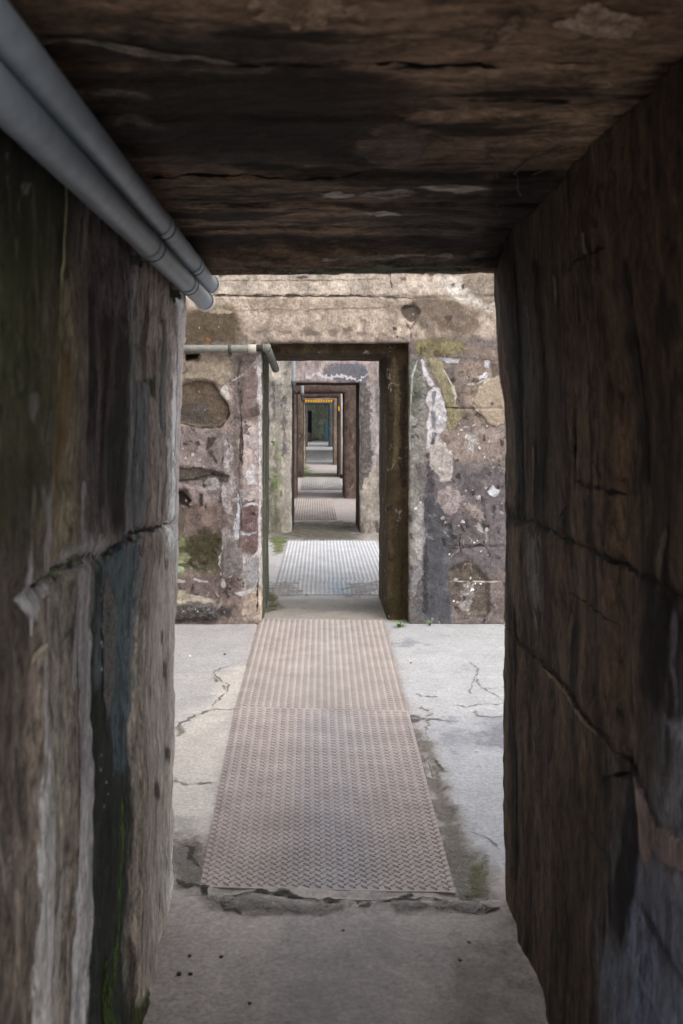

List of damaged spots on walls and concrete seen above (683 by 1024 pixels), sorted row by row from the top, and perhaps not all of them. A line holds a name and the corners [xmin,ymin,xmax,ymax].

peeling [472,377,505,427]
peeling [427,439,488,532]
crack [504,399,683,596]
crack [11,522,171,600]
leakage [15,187,168,986]
spalling [447,559,491,619]
crack [174,663,234,736]
spalling [141,304,290,1006]
crack [410,662,503,740]
crack [504,625,635,788]